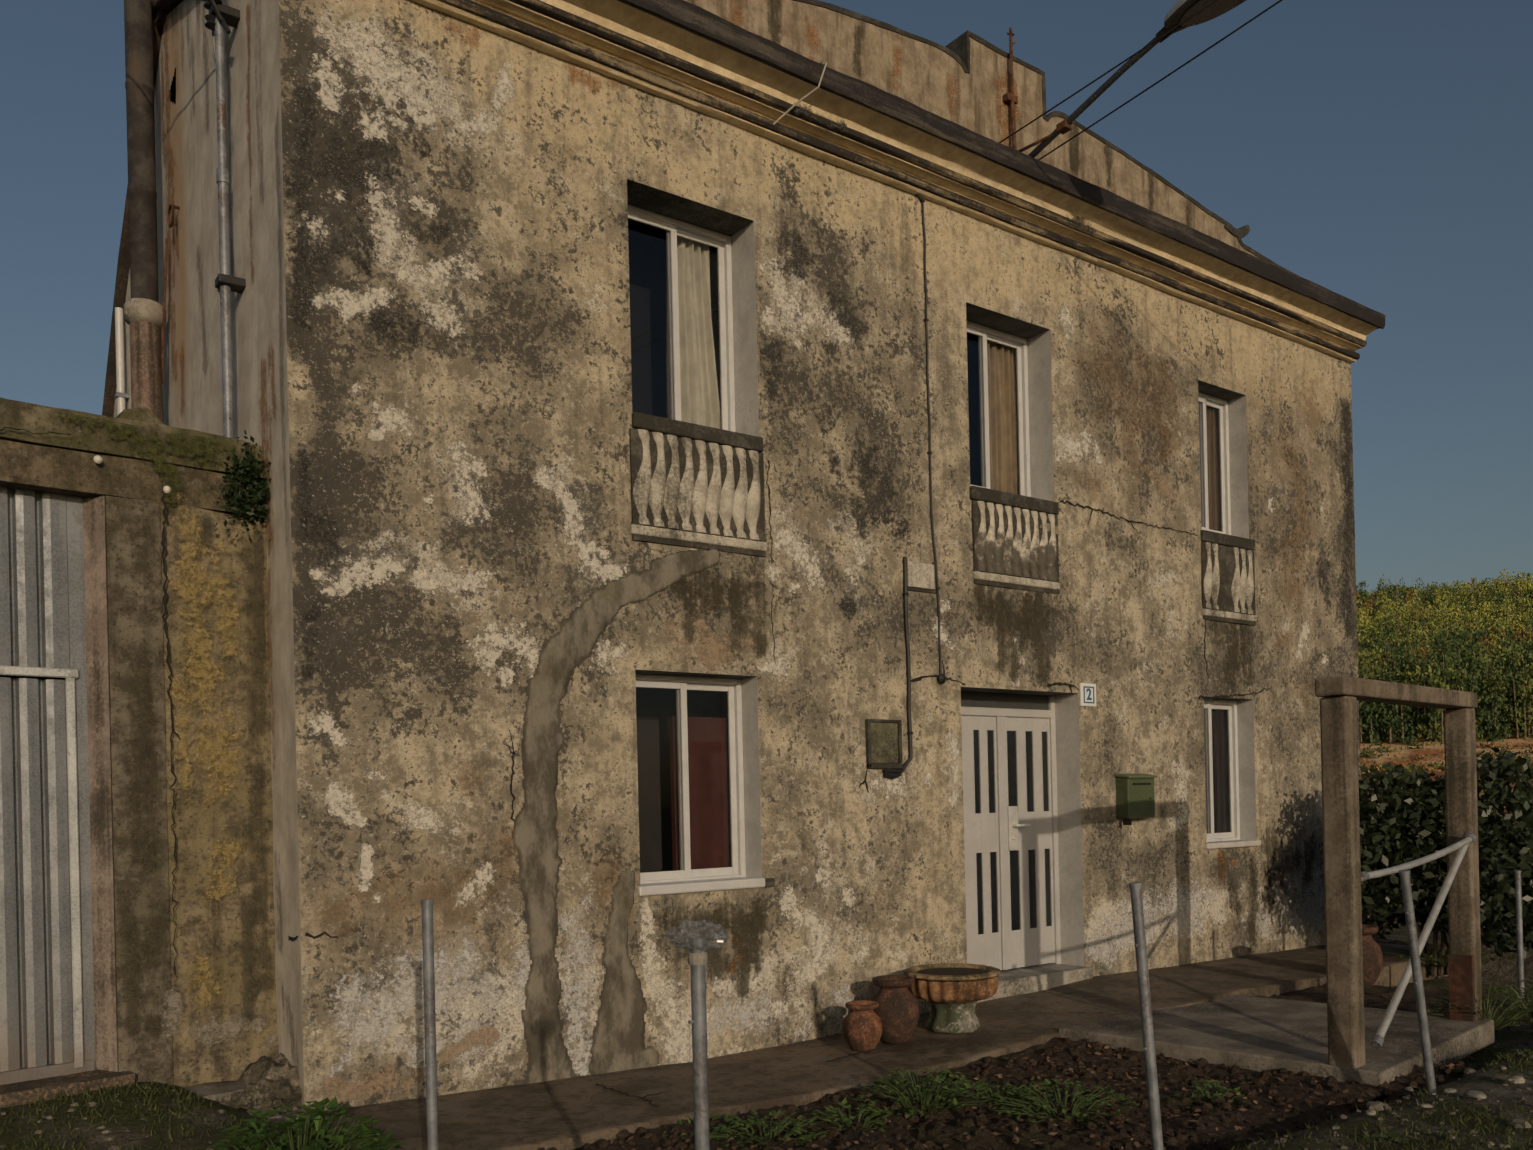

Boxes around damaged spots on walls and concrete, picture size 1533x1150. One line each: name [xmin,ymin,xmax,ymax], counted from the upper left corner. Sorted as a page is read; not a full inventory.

peeling [309,21,515,146]
rust [160,27,184,414]
leakage [285,86,432,330]
peeling [311,172,479,338]
crack [161,495,181,987]
leakage [244,528,266,733]
leakage [238,762,274,1022]
rust [259,348,276,604]
peeling [308,549,496,602]
peeling [447,441,491,526]
crack [504,549,721,1084]
leakage [659,900,851,1064]